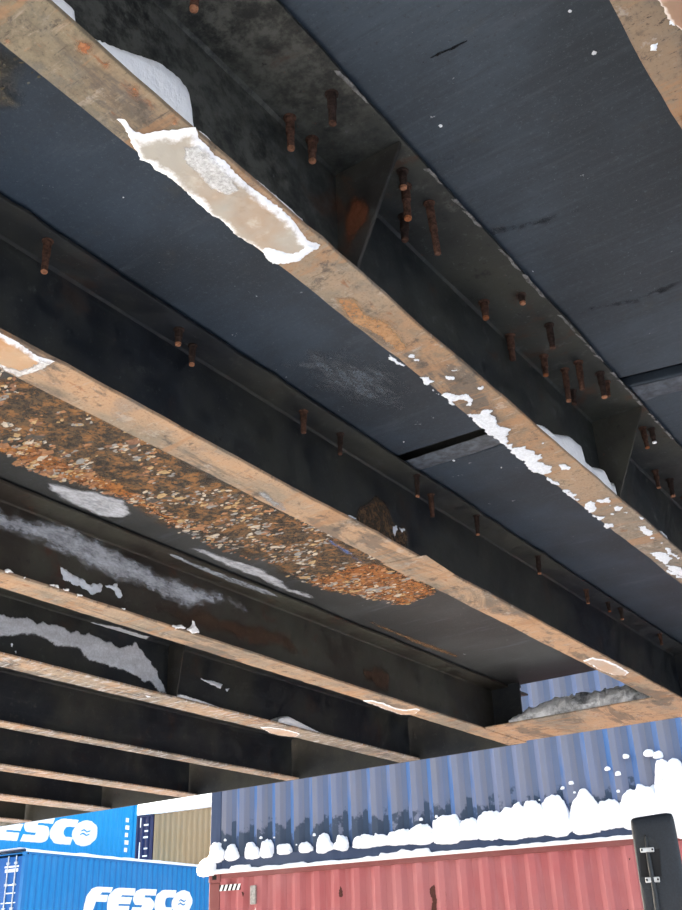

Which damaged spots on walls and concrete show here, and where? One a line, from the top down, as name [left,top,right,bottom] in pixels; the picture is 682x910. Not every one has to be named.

crack [431,40,467,58]
corrosion [0,371,435,605]